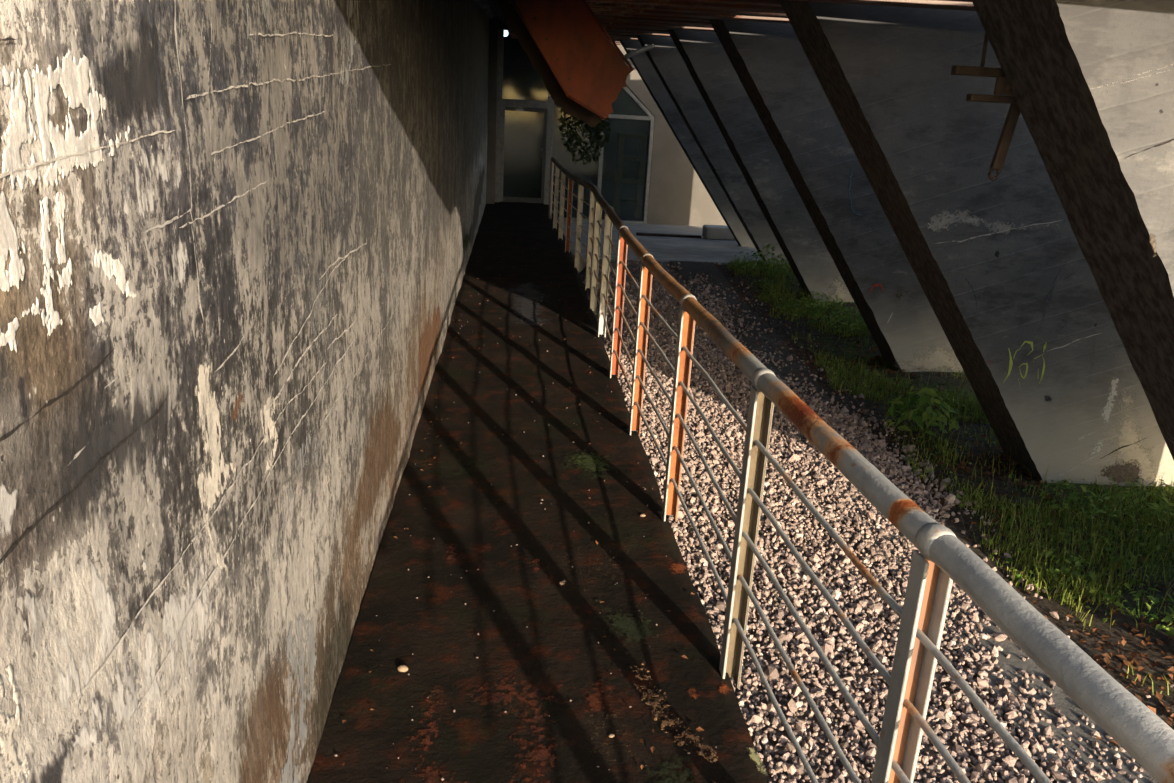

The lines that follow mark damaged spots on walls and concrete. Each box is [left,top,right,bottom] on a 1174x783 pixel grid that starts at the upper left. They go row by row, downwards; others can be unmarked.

peeling [101,0,134,23]
water stain [103,23,169,127]
peeling [0,49,130,353]
peeling [124,145,181,219]
crack [1127,138,1174,158]
peeling [92,250,137,298]
crack [0,349,114,442]
crack [0,392,171,564]
rust [314,594,351,743]
peeling [0,665,30,783]
rust [411,689,467,783]
rust [467,678,563,783]